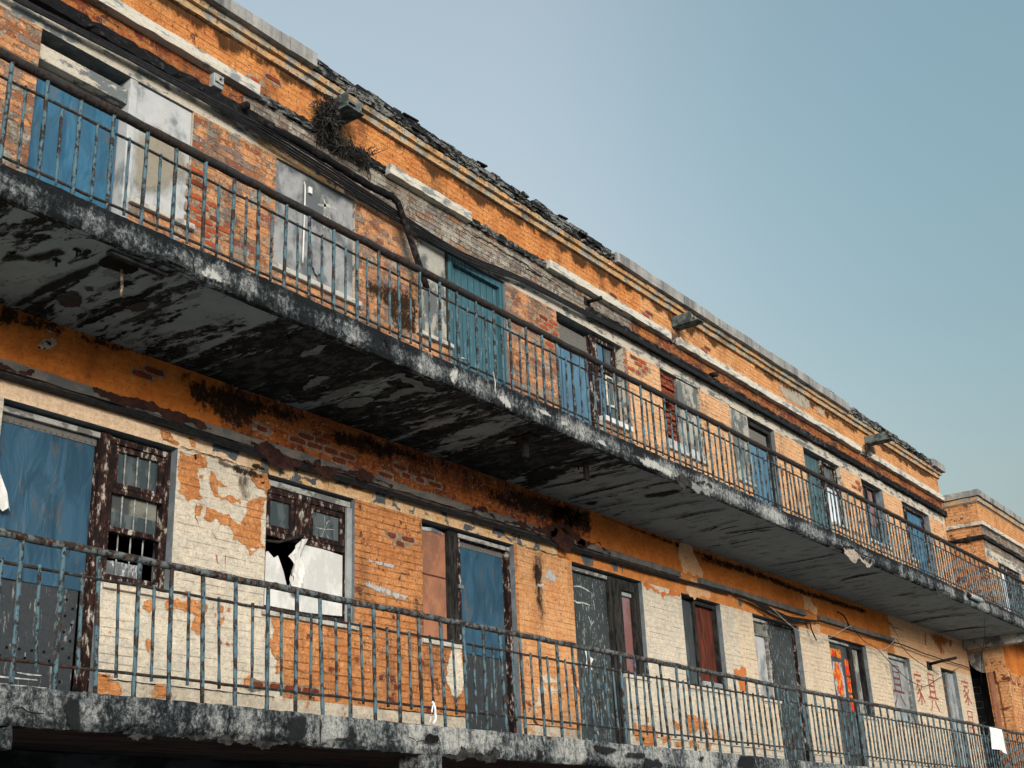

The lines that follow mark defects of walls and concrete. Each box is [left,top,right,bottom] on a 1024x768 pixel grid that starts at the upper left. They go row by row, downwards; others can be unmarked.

spalling [98,249,167,312]
peeling [328,362,436,408]
mould [181,372,433,463]
peeling [160,408,272,556]
flaking render [288,430,443,505]
water stain [533,556,557,618]
peeling [643,543,711,600]
spalling [844,548,873,568]
peeling [244,616,327,695]
water stain [63,695,83,730]
water stain [286,714,308,743]
water stain [346,726,357,747]